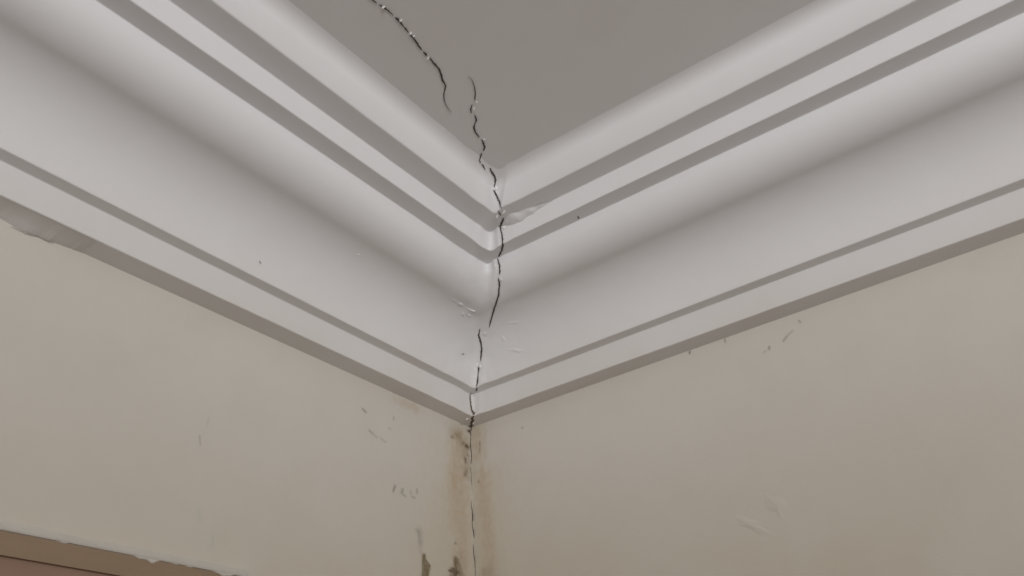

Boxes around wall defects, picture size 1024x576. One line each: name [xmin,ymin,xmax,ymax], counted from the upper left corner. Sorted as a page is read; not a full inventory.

crack [372,0,505,576]
leakage [387,392,538,576]